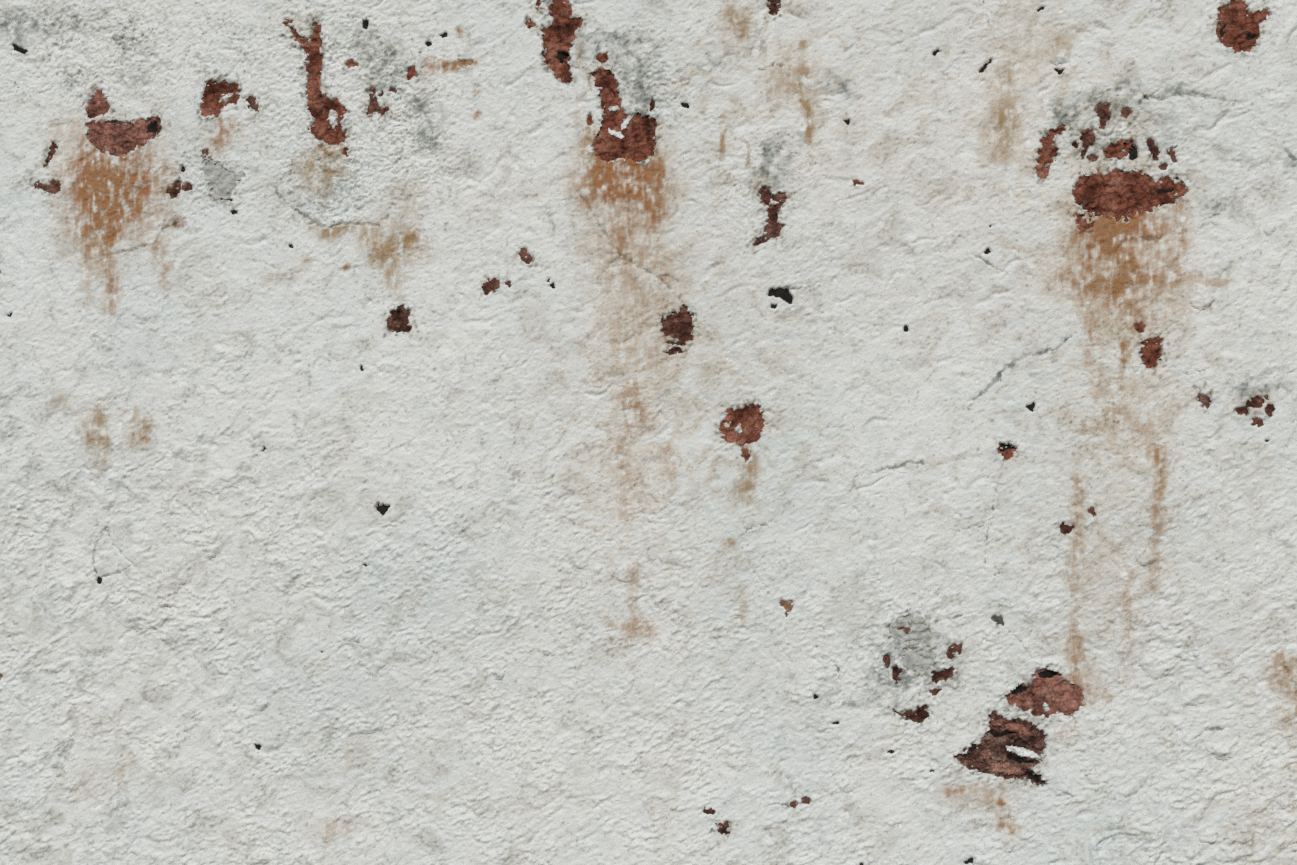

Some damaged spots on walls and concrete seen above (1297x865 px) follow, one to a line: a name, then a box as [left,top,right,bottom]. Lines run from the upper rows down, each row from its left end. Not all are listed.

rust [70,149,158,305]
spalling [84,89,162,158]
spalling [198,75,259,120]
spalling [281,18,349,157]
spalling [525,0,661,166]
rust [581,137,666,256]
spalling [1034,102,1192,234]
rust [1070,211,1168,304]
spalling [1215,0,1270,56]
spalling [656,303,695,355]
spalling [715,401,766,463]
spalling [953,664,1087,788]